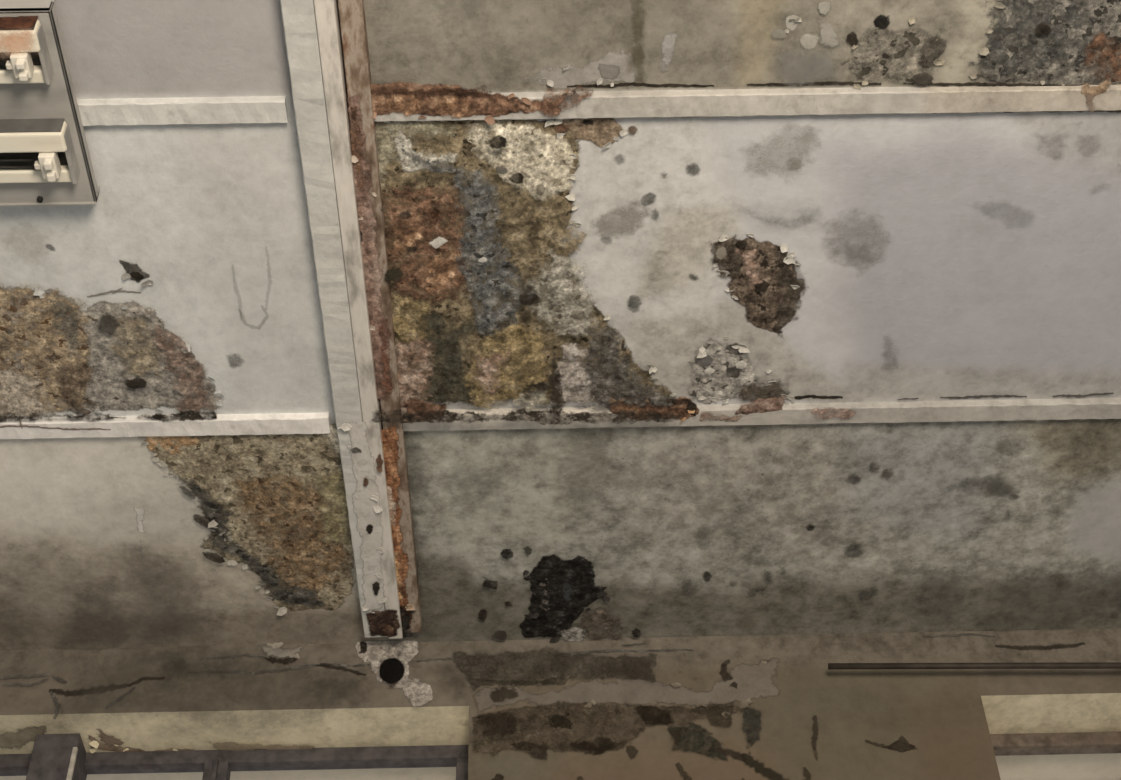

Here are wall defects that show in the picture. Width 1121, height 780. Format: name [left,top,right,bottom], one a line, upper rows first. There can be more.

spalling [968,0,1121,87]
corrosion [1081,81,1111,112]
spalling [0,286,225,422]
corrosion [345,81,593,638]
spalling [138,118,806,616]
leakage [870,463,893,478]
leakage [962,476,1019,499]
spalling [501,546,641,643]
leakage [682,571,711,595]
crack [0,654,370,719]
crack [676,762,692,780]
crack [716,715,818,780]